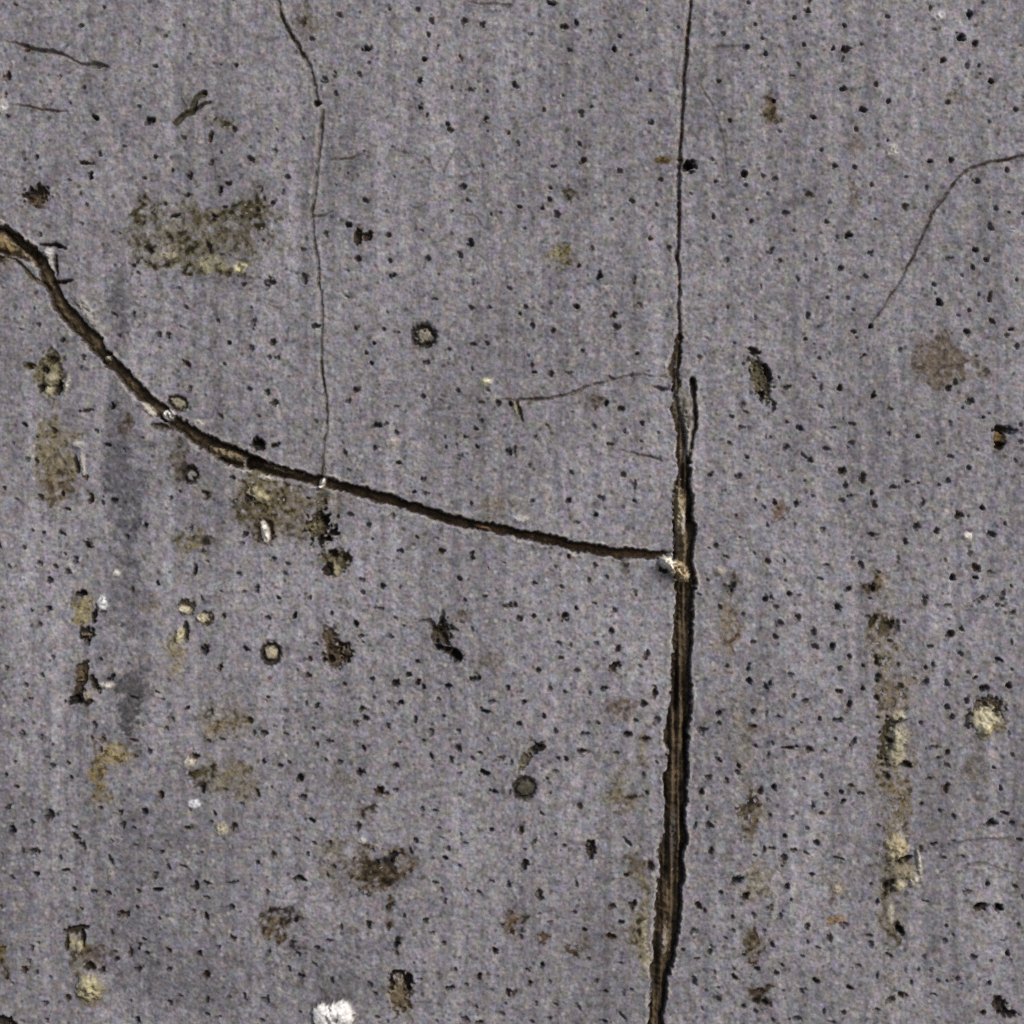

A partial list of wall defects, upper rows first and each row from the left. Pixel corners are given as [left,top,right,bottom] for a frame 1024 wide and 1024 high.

crack [870,153,1024,324]
crack [0,0,745,1024]
damp [885,900,896,926]